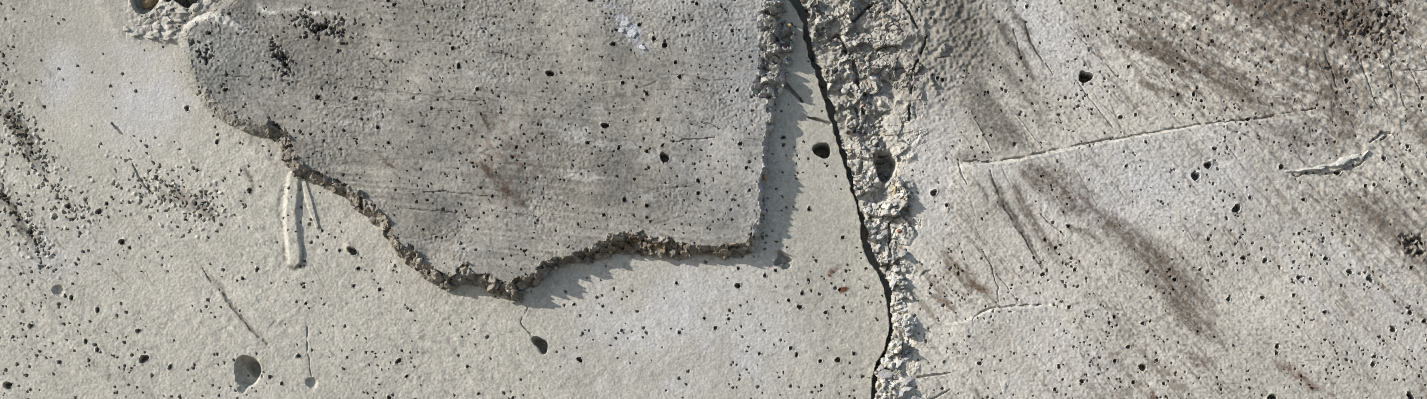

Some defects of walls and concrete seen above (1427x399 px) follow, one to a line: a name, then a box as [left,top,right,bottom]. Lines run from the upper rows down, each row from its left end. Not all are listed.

peeling [122,0,926,399]
crack [783,0,928,399]
crack [916,372,951,399]